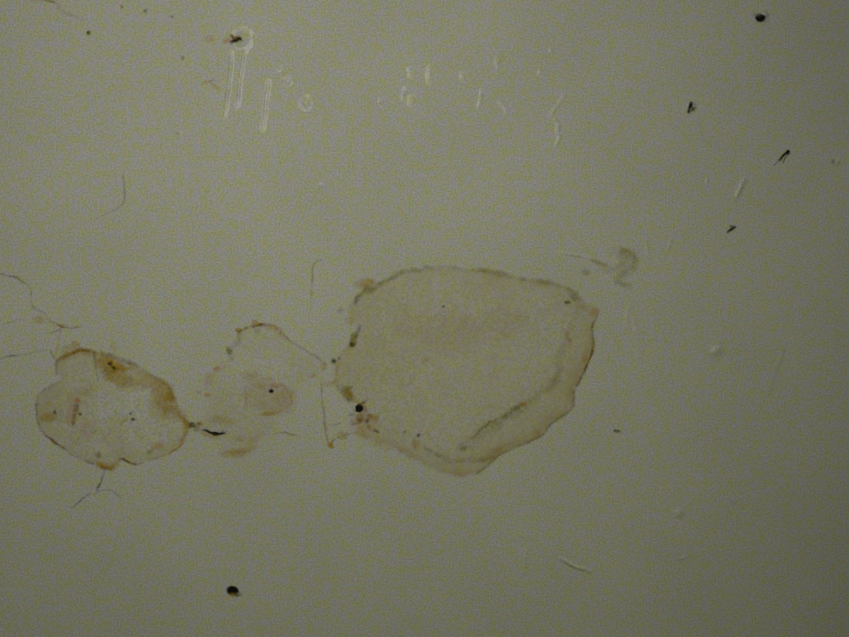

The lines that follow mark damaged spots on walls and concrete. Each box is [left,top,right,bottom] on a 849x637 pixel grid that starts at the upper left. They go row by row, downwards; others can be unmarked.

water stain [36,265,599,477]